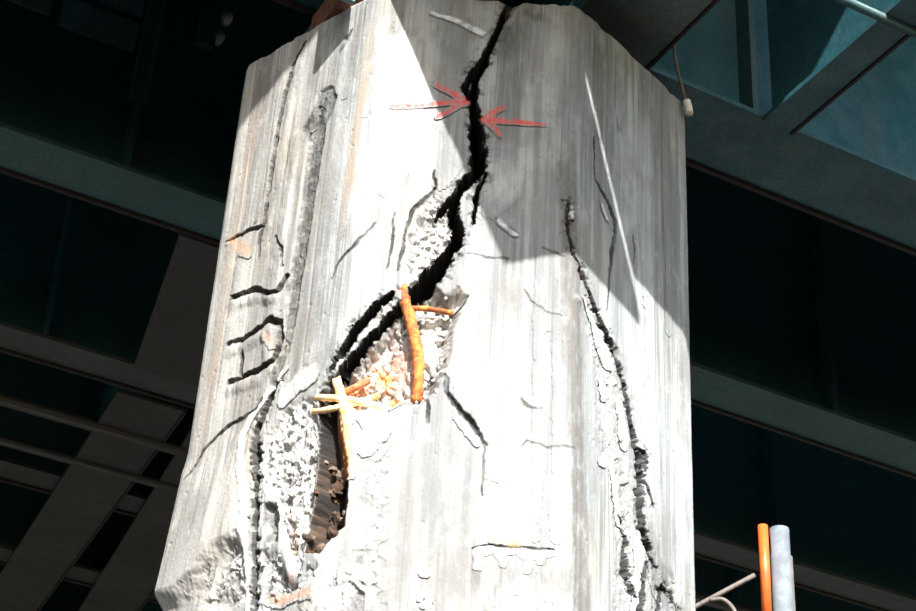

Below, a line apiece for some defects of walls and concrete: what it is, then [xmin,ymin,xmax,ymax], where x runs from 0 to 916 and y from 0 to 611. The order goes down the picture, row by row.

crack [184,40,308,611]
spalling [268,84,339,390]
spalling [170,192,471,611]
rust [336,402,358,491]
rust [350,319,425,411]
crack [321,7,518,405]
leakage [310,0,553,241]
crack [426,372,498,496]
peeling [453,414,481,447]
leakage [348,5,629,611]
crack [557,136,675,611]
leakage [661,96,673,337]